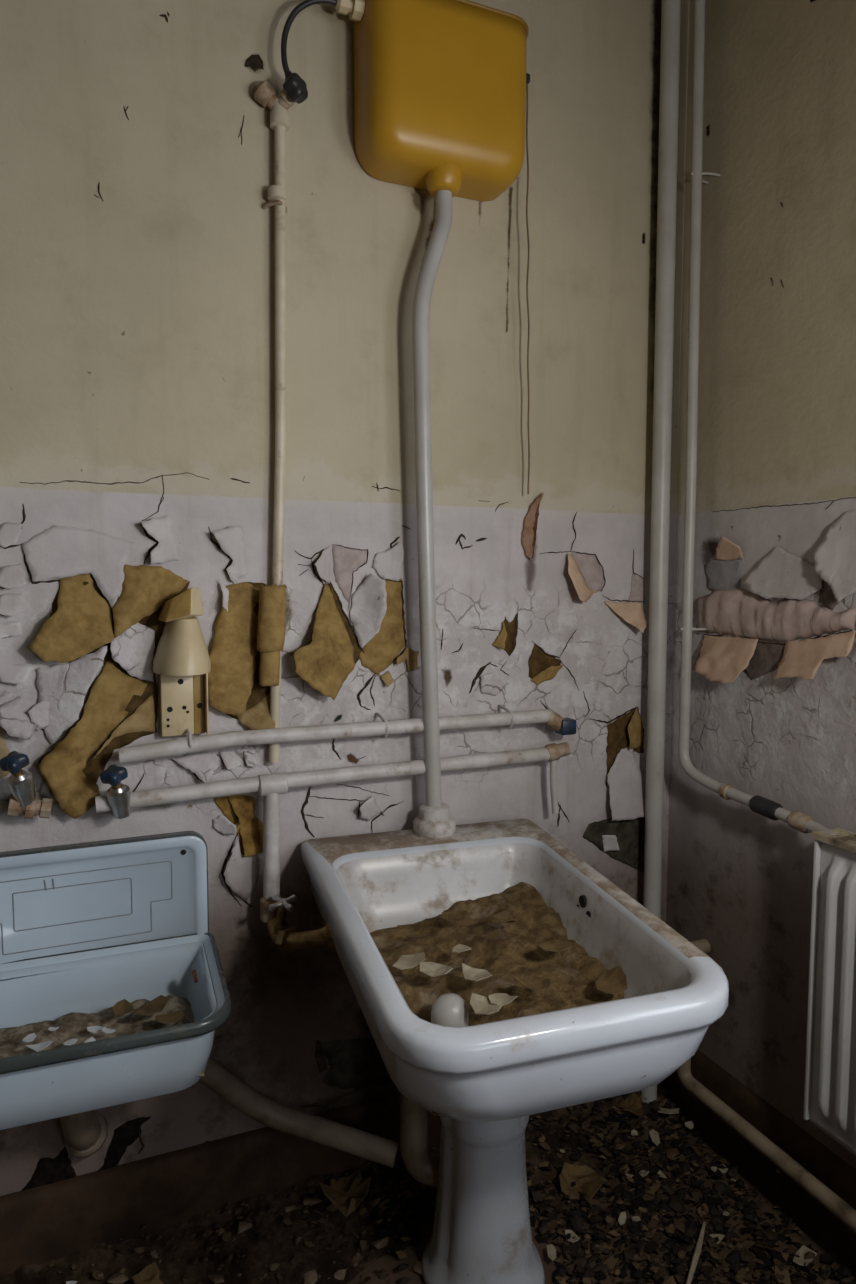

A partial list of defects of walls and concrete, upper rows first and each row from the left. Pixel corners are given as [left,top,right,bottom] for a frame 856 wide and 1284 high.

crack [20,472,250,502]
peeling [540,512,647,633]
peeling [704,510,856,610]
peeling [0,497,190,819]
peeling [208,525,419,730]
peeling [692,630,856,683]
peeling [172,750,258,783]
peeling [212,795,263,907]
peeling [337,784,403,833]
peeling [583,706,646,872]
flaking render [21,1147,76,1191]
flaking render [97,1116,152,1171]